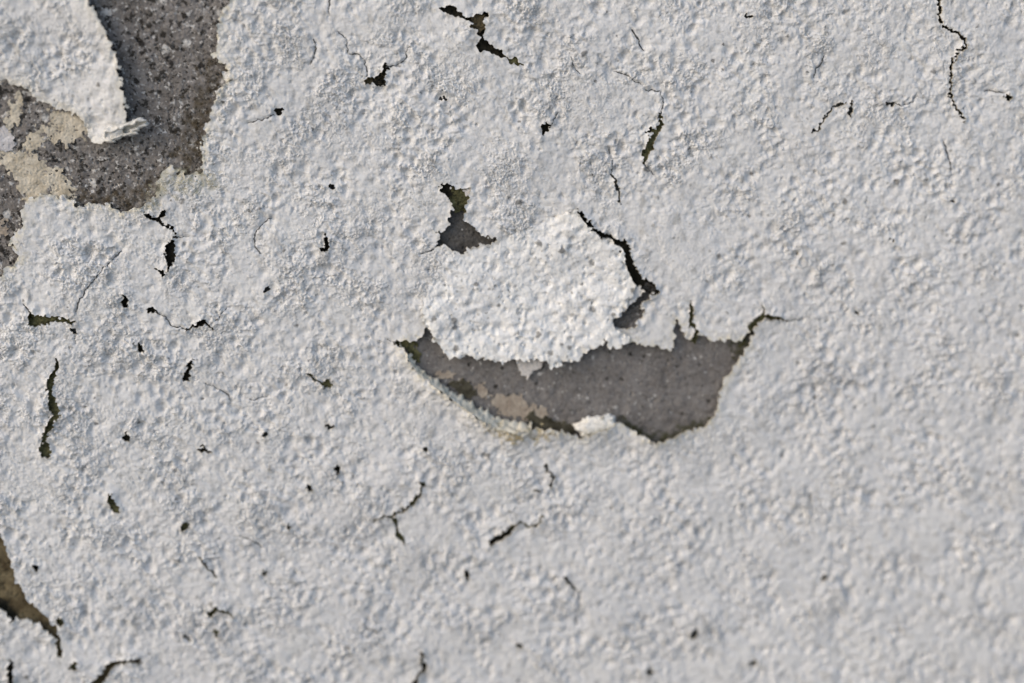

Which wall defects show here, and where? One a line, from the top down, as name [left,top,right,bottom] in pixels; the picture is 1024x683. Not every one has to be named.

peeling [0,0,232,276]
crack [310,0,410,86]
crack [615,71,664,175]
crack [811,100,853,133]
crack [937,0,967,122]
crack [22,250,122,457]
crack [144,210,188,277]
peeling [394,183,758,444]
crack [577,208,660,329]
crack [373,481,425,544]
crack [488,464,555,545]
peeling [0,534,63,657]